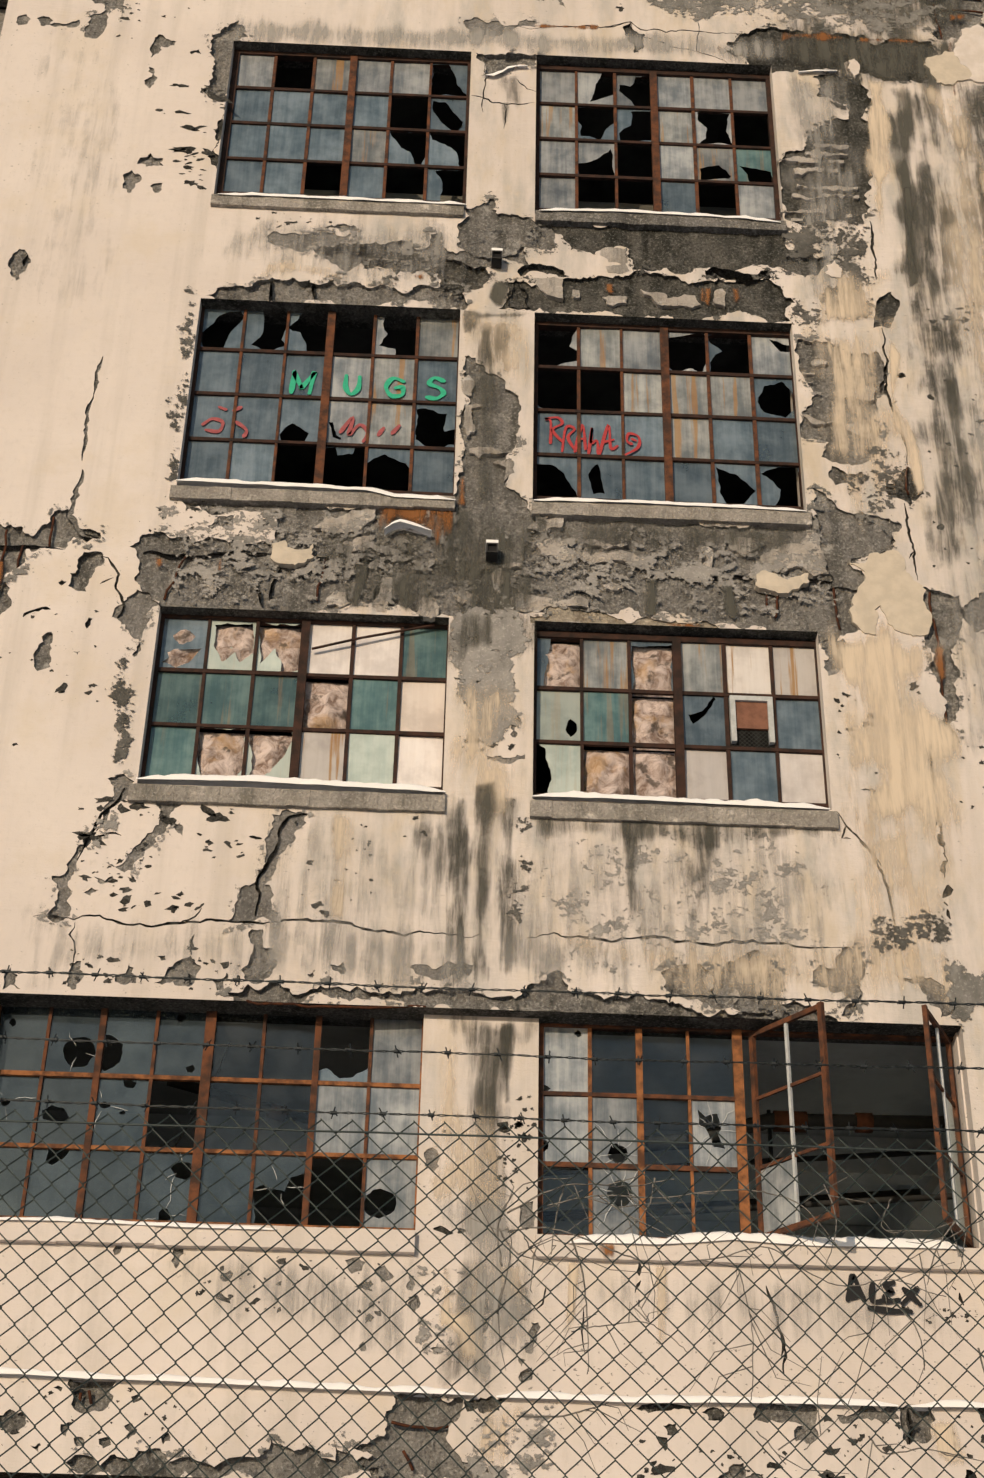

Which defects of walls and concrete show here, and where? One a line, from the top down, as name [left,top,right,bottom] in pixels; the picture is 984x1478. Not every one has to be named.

spalling [8,249,31,280]
water stain [254,0,984,552]
crack [66,357,125,617]
spalling [0,504,108,614]
water stain [333,511,531,652]
water stain [447,691,532,980]
water stain [622,822,728,907]
spalling [3,968,20,989]
crack [35,908,479,965]
water stain [434,1024,521,1375]
spalling [195,1255,312,1313]
peeling [336,1257,540,1384]